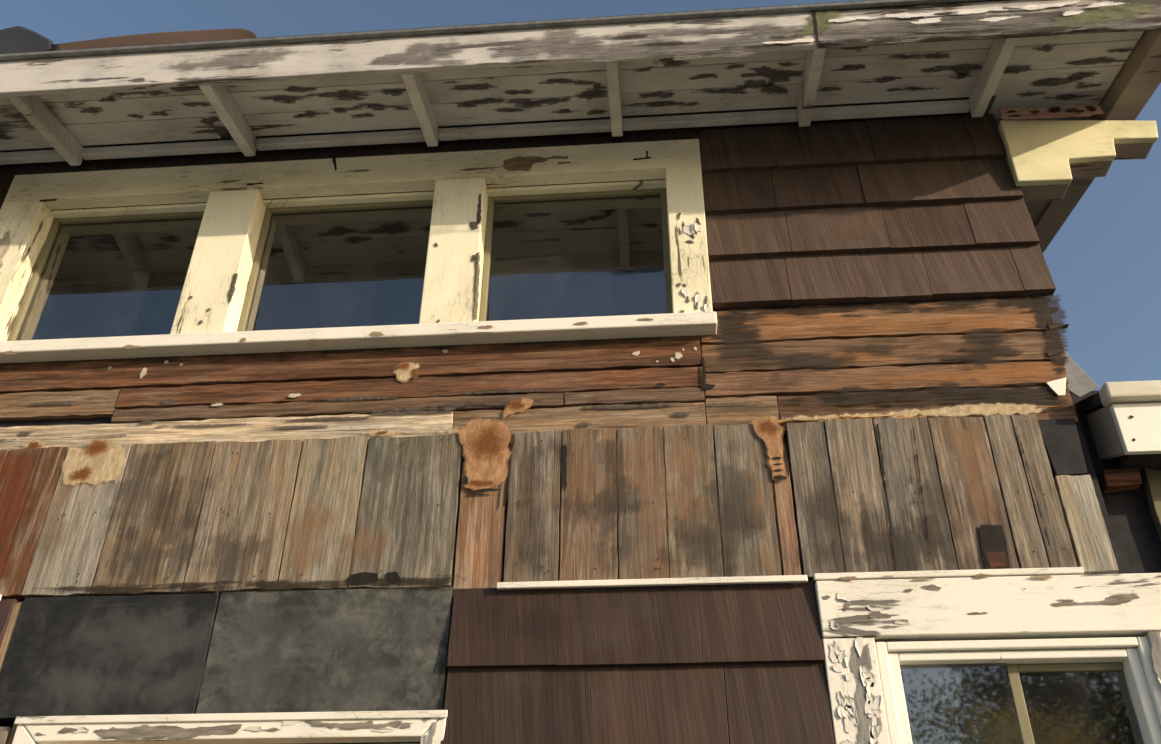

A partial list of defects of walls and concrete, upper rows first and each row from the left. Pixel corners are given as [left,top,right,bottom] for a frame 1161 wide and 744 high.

damp [162,48,297,71]
damp [370,42,473,65]
damp [491,28,699,62]
peeling [503,156,571,171]
damp [704,295,1052,370]
damp [0,356,182,366]
damp [782,381,1068,414]
spalling [905,577,941,592]
spalling [822,576,910,628]
peeling [1051,593,1140,607]
peeling [830,620,882,744]
peeling [59,718,436,744]